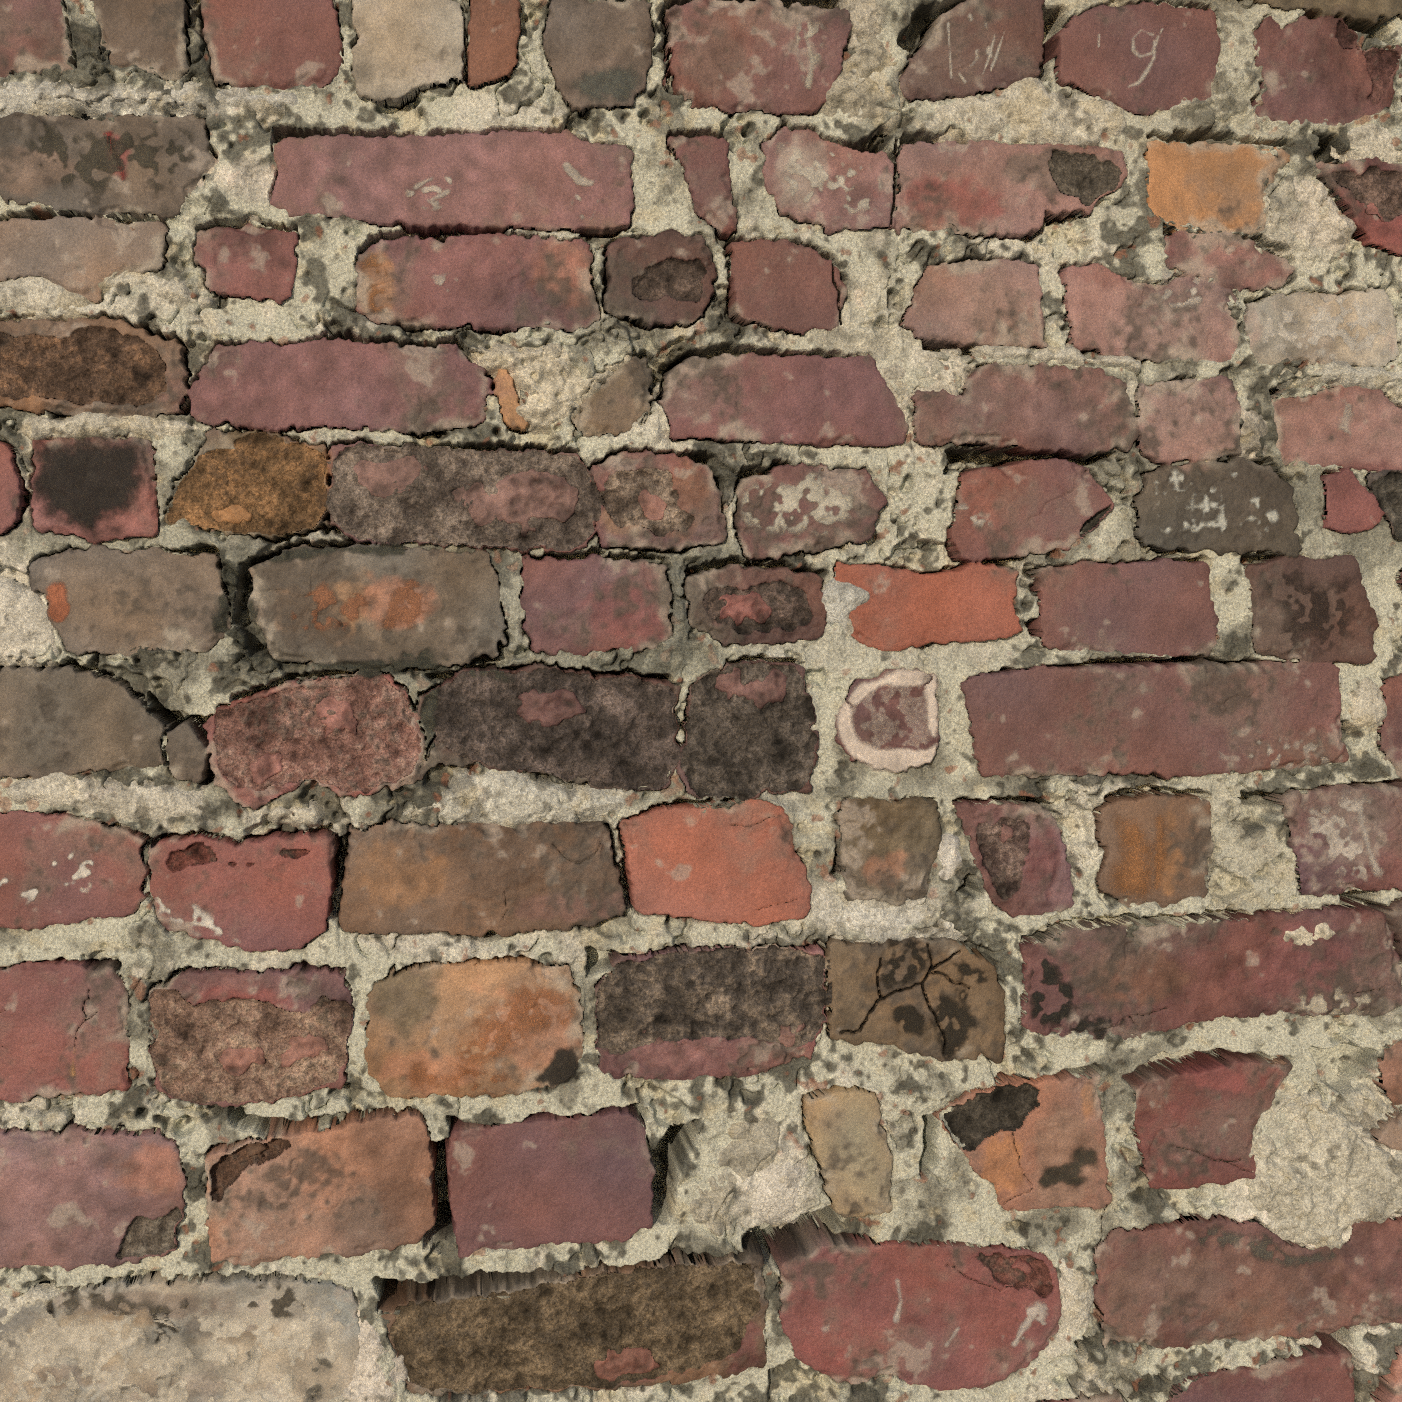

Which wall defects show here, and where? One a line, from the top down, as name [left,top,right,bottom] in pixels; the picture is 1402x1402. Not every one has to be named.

spalling [1048,149,1122,206]
spalling [1331,166,1402,222]
crack [840,943,970,1053]
spalling [940,1083,1040,1152]